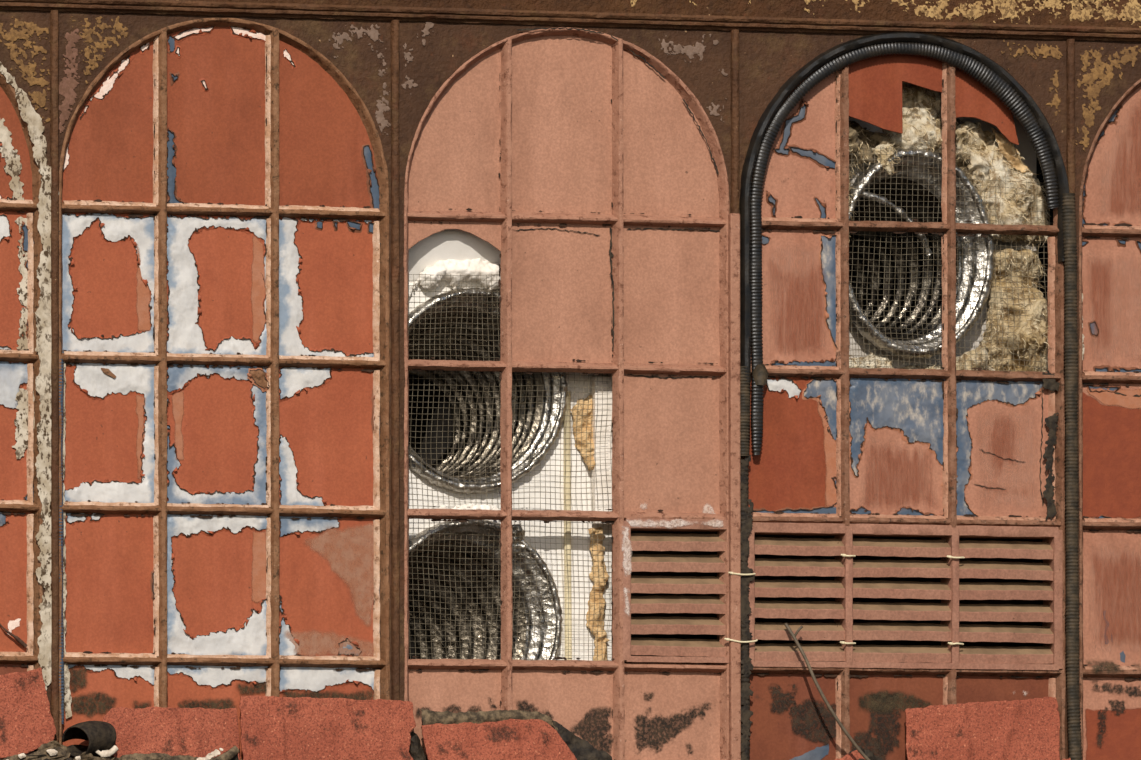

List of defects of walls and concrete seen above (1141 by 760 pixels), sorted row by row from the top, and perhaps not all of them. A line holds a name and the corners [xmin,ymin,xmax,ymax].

peeling [890,0,1141,28]
peeling [1001,40,1063,125]
peeling [1075,46,1141,152]
peeling [773,98,836,170]
peeling [766,190,778,218]
peeling [813,196,827,219]
peeling [0,16,381,694]
peeling [764,234,1060,521]
leakage [634,693,711,752]
leakage [770,684,836,745]
leakage [852,691,931,760]
leakage [1094,681,1141,746]